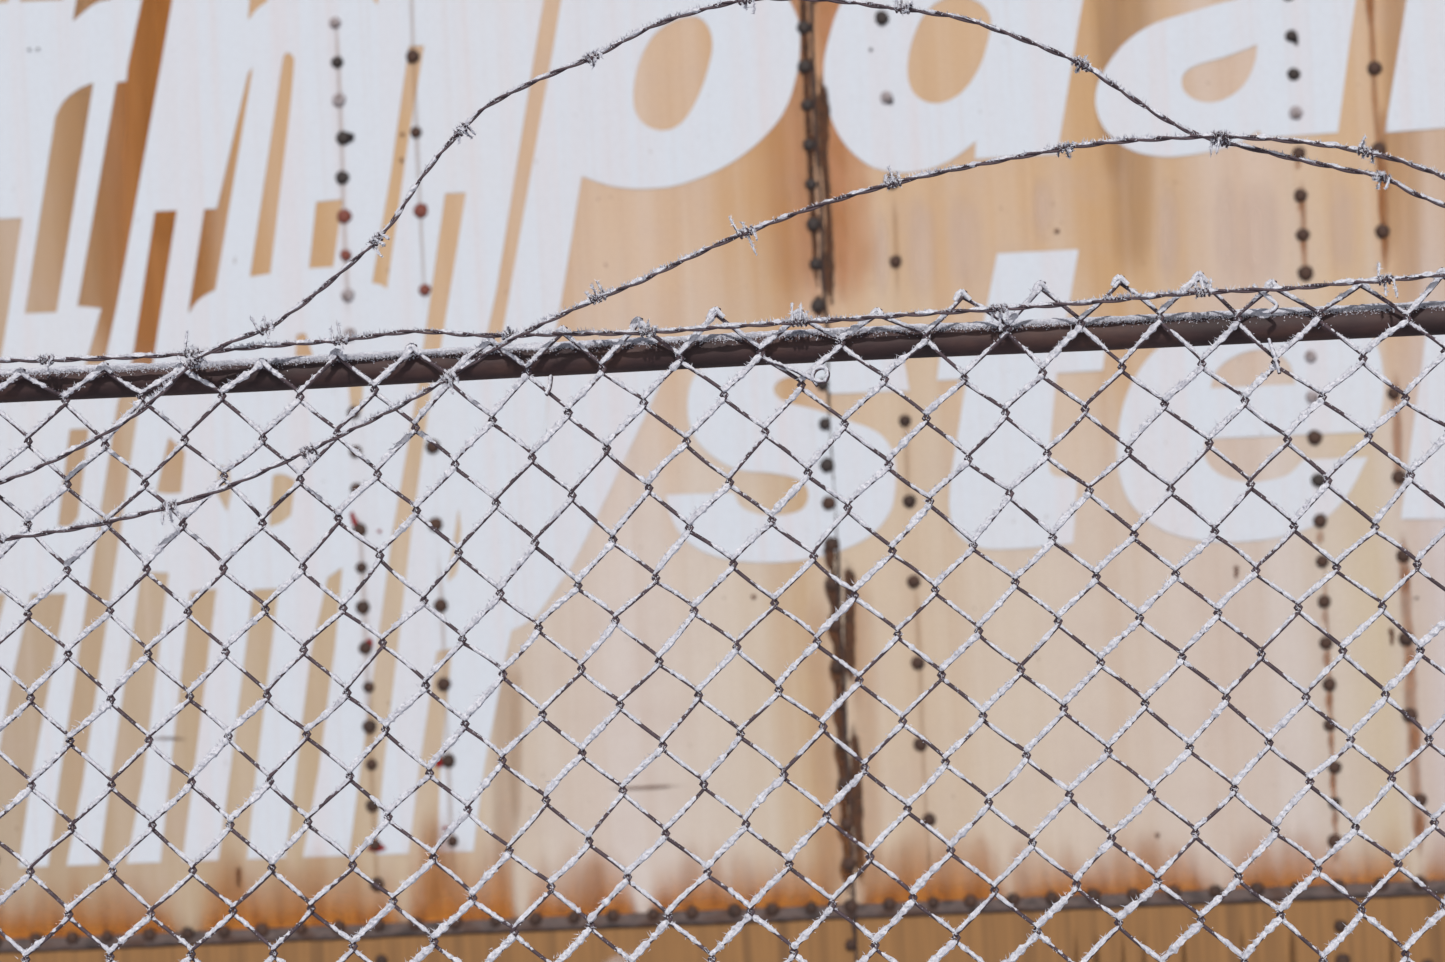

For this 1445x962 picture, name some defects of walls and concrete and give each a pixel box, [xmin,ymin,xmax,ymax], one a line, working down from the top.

corrosion [800,0,835,317]
corrosion [1026,872,1200,897]
corrosion [1238,867,1401,888]
corrosion [210,867,392,930]
corrosion [414,885,513,922]
corrosion [534,891,632,917]
corrosion [657,888,828,912]
corrosion [0,914,168,939]